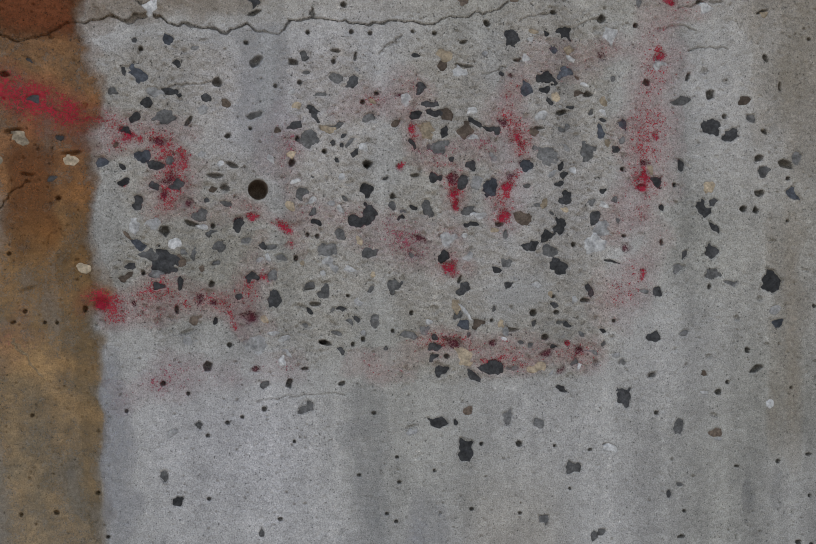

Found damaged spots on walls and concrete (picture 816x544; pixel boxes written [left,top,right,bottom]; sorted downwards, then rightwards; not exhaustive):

corrosion [0,0,111,544]
crack [74,0,550,55]